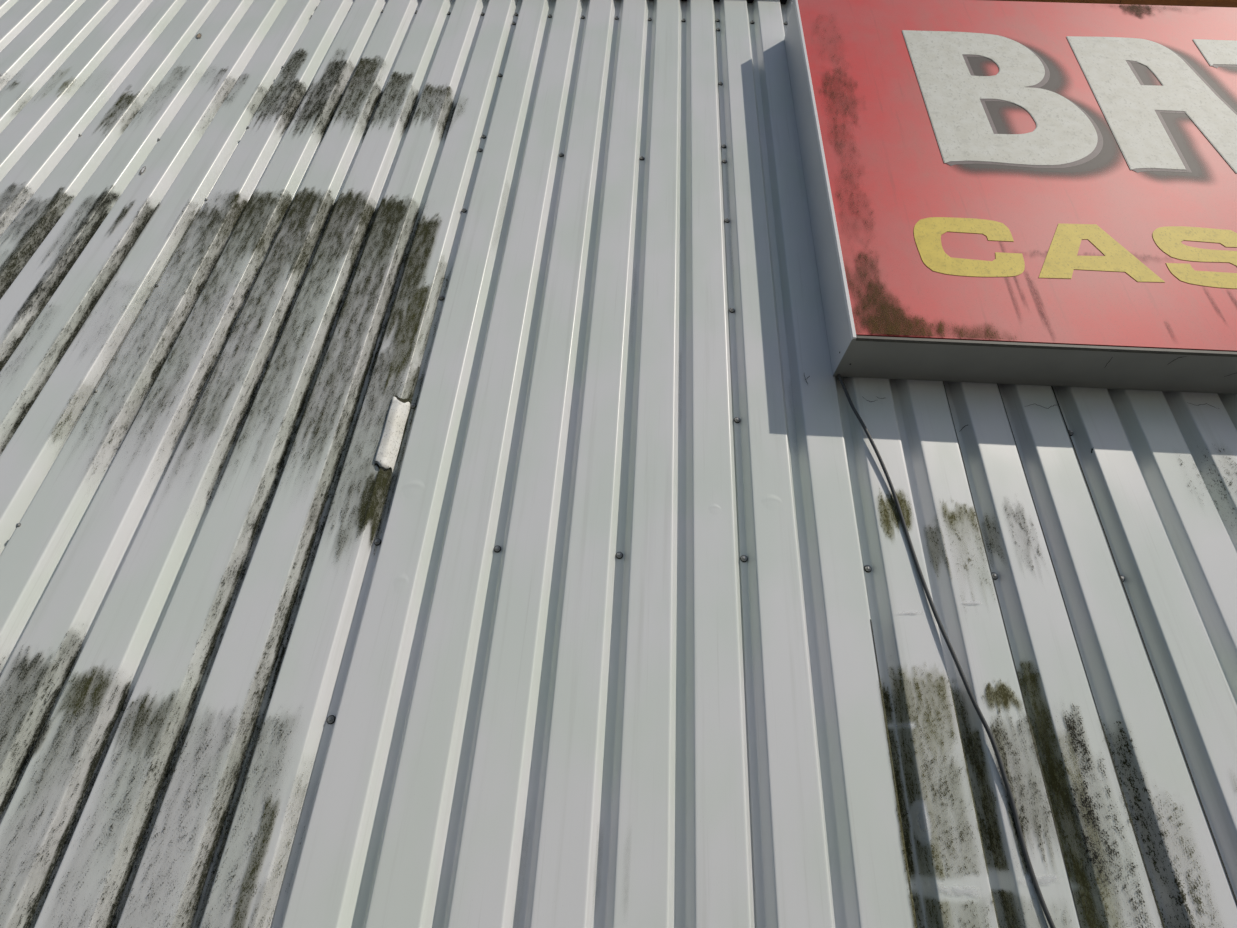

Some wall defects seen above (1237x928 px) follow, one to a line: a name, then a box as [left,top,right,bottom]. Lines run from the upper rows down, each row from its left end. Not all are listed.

leakage [249,49,466,141]
leakage [814,14,1017,340]
leakage [878,488,1045,597]
leakage [879,661,1224,928]